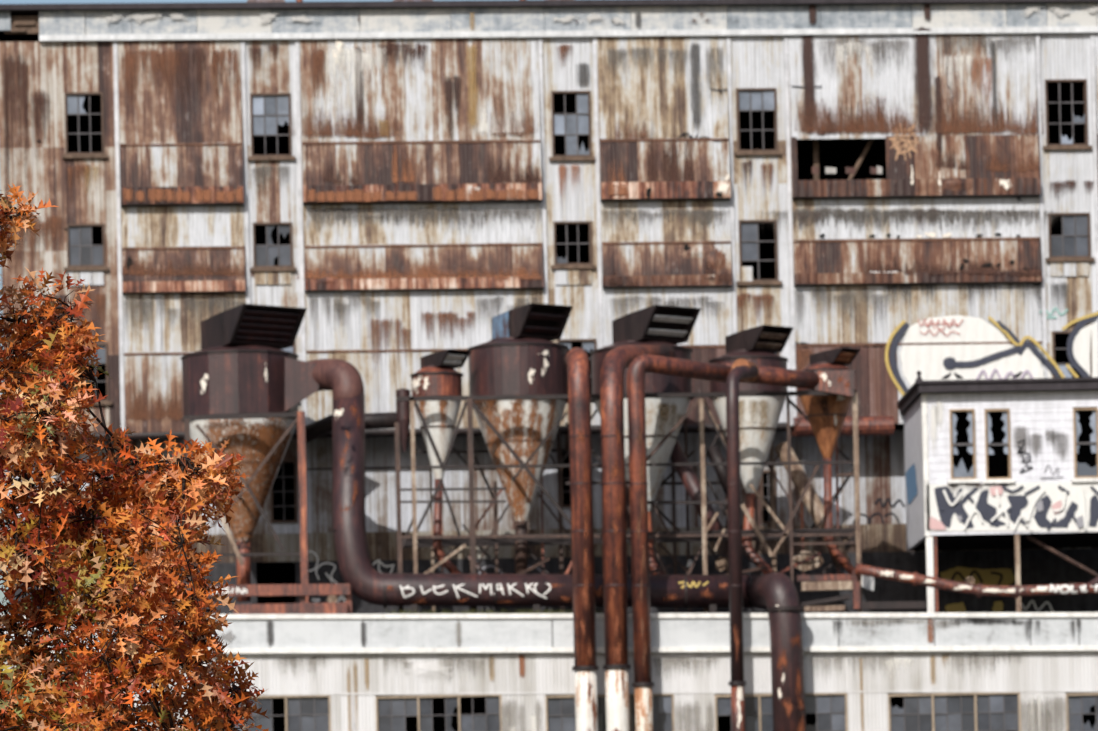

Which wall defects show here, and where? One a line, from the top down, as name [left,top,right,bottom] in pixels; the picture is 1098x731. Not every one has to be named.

corrosion [3,54,49,174]
corrosion [121,44,278,104]
corrosion [301,47,395,139]
corrosion [445,75,461,136]
corrosion [798,56,1043,136]
corrosion [123,189,243,202]
corrosion [305,150,416,203]
corrosion [433,162,538,203]
corrosion [614,119,694,182]
corrosion [474,399,557,520]
peeling [588,683,597,731]
peeling [640,693,649,731]